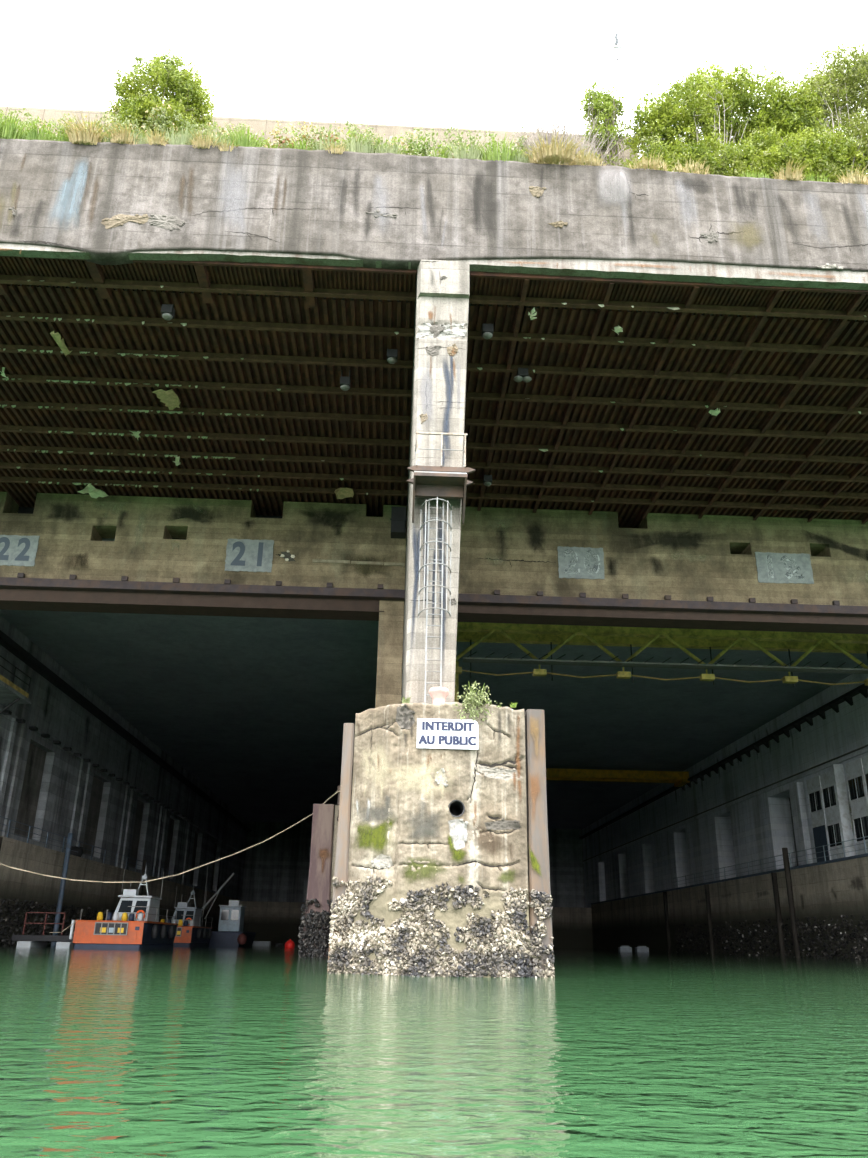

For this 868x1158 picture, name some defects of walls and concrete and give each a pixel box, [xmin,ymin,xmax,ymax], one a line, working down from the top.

damp [58,164,97,219]
spalling [101,214,185,231]
peeling [3,316,97,356]
spalling [416,322,467,356]
peeling [109,384,204,415]
damp [442,357,453,466]
peeling [88,431,173,439]
damp [810,534,868,560]
spalling [448,819,468,850]
spalling [485,818,522,831]